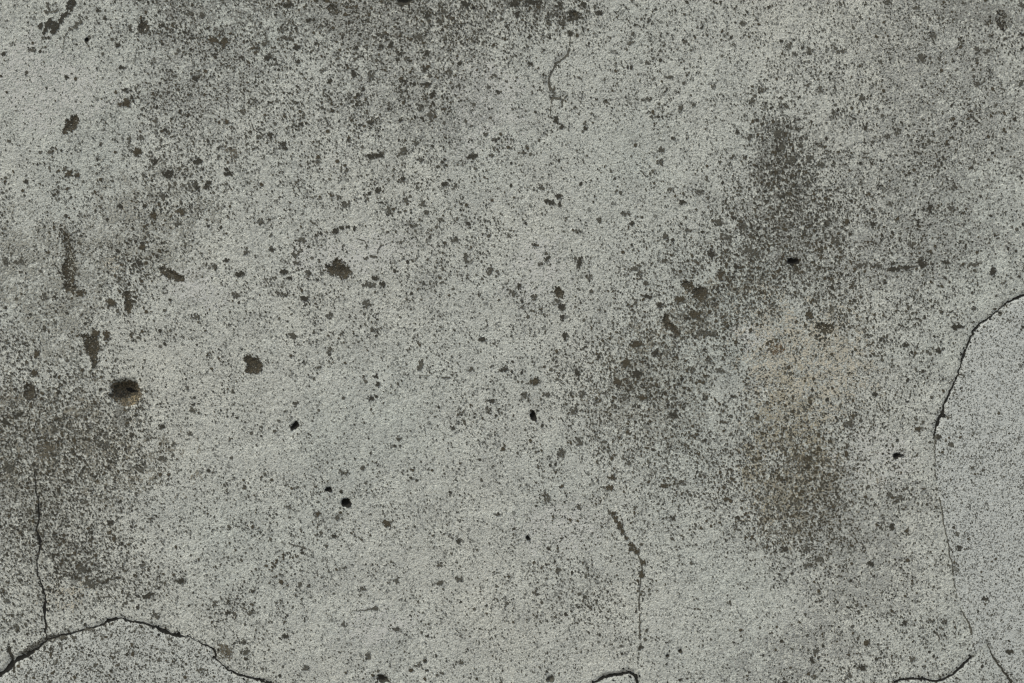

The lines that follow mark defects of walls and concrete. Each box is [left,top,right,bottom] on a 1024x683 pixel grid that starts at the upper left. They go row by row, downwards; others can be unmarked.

crack [0,468,272,683]
crack [893,270,1024,683]